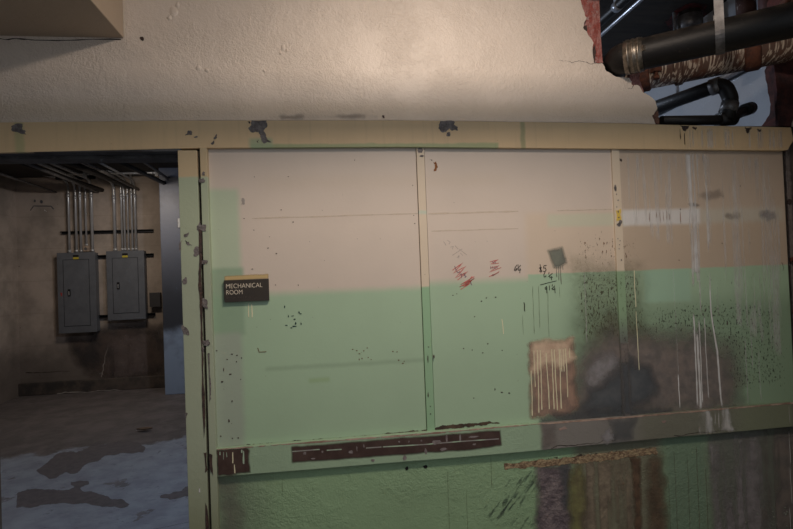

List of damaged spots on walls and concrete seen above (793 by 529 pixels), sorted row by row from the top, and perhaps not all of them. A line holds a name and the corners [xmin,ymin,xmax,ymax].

flaking render [581,0,603,64]
flaking render [628,72,644,92]
spalling [771,60,793,127]
water stain [576,154,783,430]
peeling [179,222,217,434]
peeling [204,437,250,476]
peeling [292,431,501,462]
water stain [535,457,665,529]